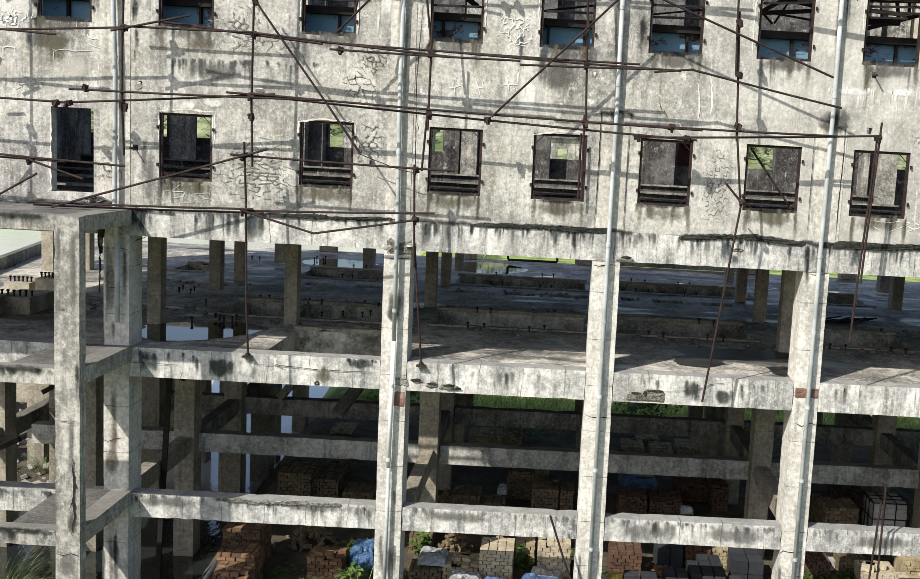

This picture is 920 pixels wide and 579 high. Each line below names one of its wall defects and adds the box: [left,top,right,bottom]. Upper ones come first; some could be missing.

crack [207,1,302,58]
water stain [172,58,251,79]
crack [339,43,390,171]
crack [415,11,423,164]
crack [807,133,815,231]
crack [835,129,846,239]
water stain [805,246,818,279]
water stain [210,360,232,376]
water stain [347,358,376,368]
water stain [685,381,700,399]
water stain [716,385,764,403]
crack [58,459,77,556]